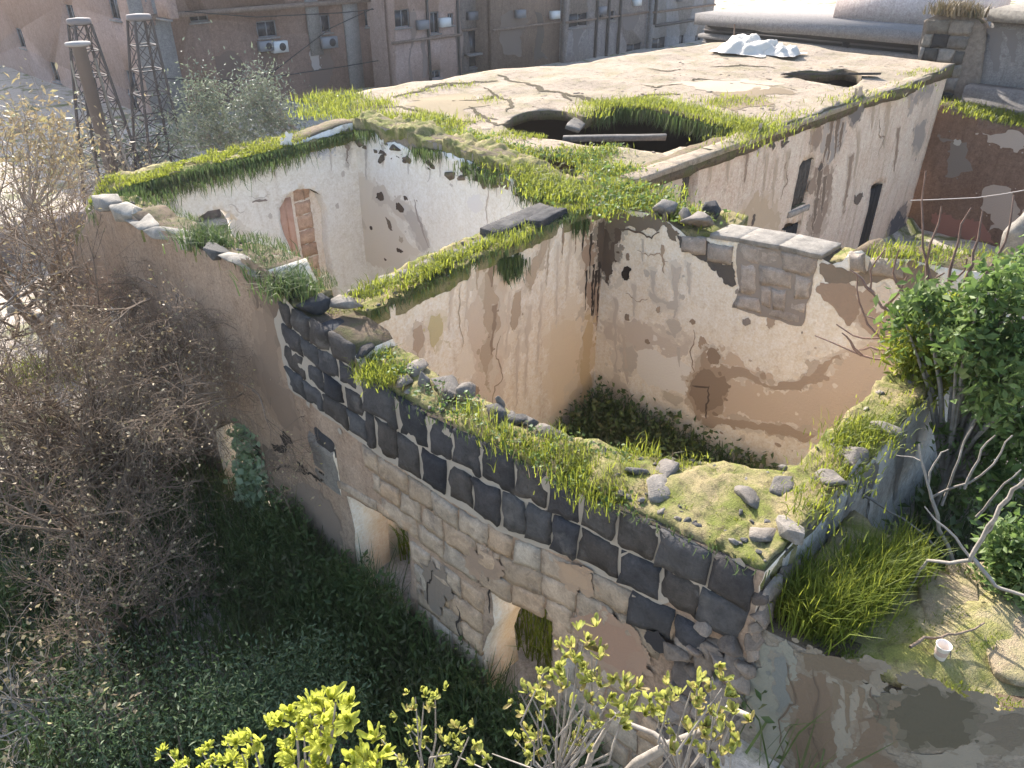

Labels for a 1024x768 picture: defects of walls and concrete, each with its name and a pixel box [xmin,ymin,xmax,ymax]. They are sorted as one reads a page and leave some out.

crack [377,64,795,125]
spalling [385,196,408,253]
spalling [621,253,650,280]
spalling [605,209,682,250]
damp [737,145,791,232]
flaking render [692,240,938,329]
damp [801,82,1024,244]
damp [405,206,903,451]
peeling [636,334,731,416]
crack [689,332,710,418]
peeling [745,639,801,761]
peeling [826,676,881,768]